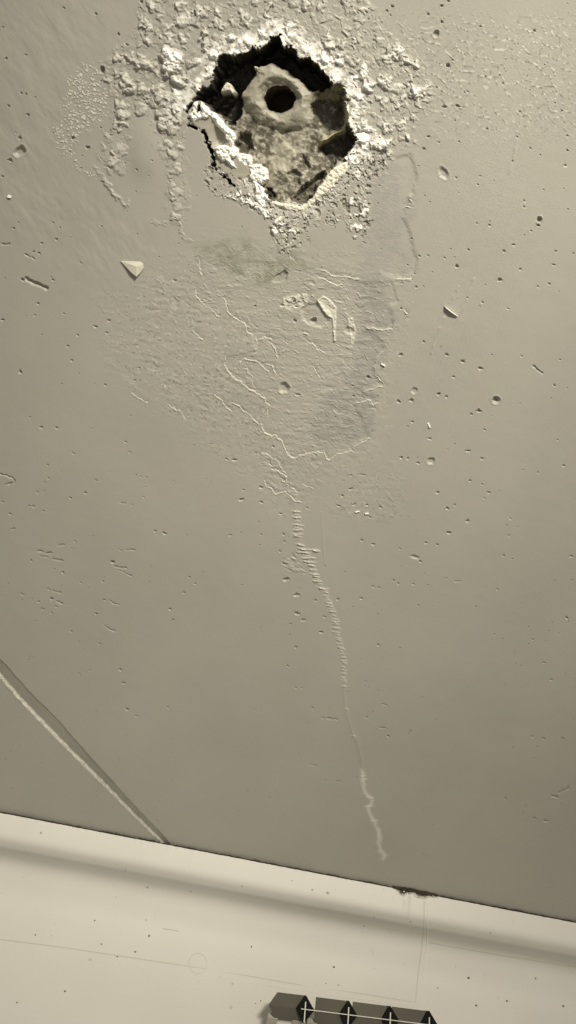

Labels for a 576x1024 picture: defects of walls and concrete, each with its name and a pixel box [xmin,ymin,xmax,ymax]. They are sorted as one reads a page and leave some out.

spalling [185,33,359,220]
crack [288,487,390,863]